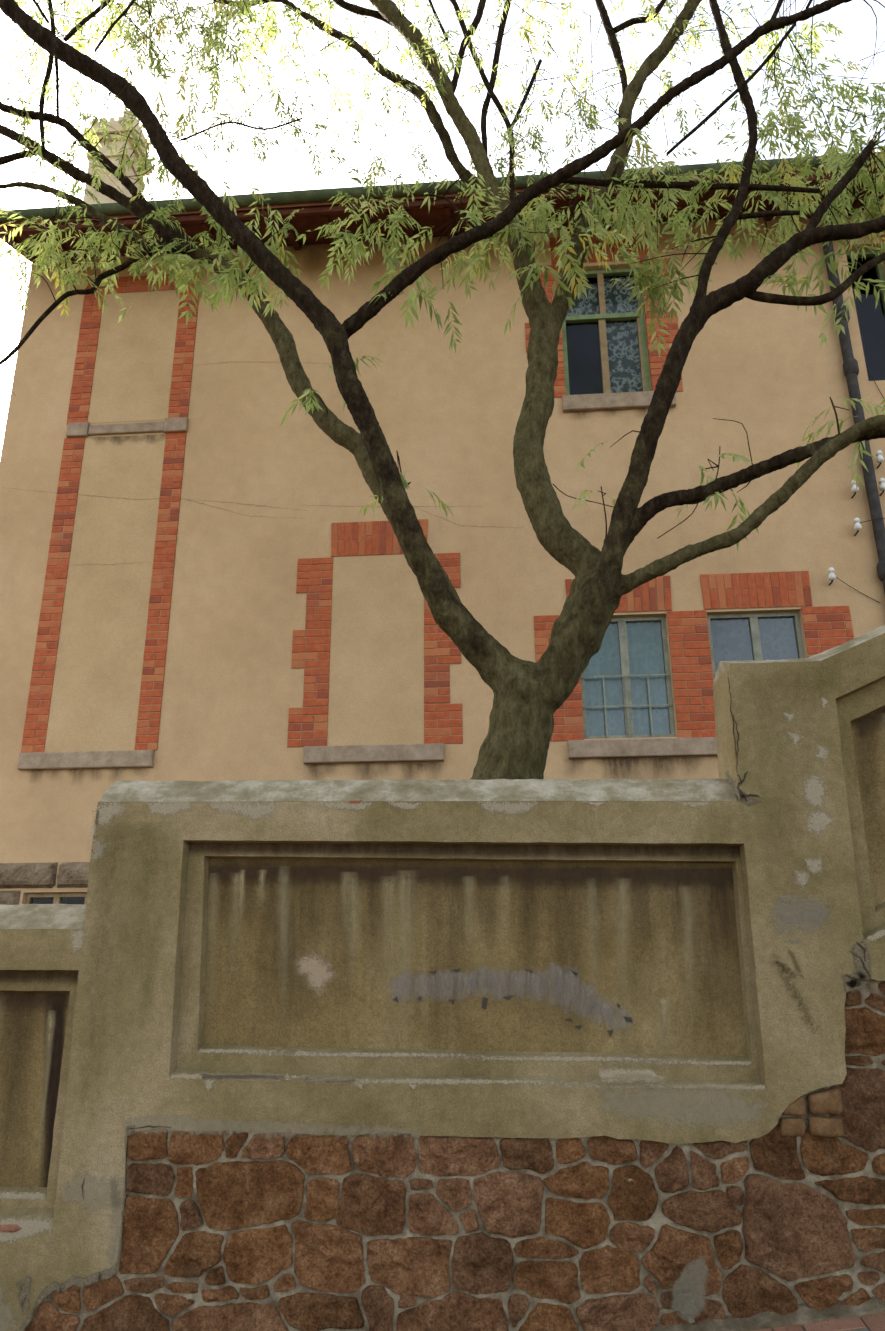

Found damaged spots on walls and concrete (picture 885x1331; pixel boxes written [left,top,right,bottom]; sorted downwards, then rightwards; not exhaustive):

crack [728,678,739,771]
peeling [298,955,334,996]
flaking render [843,930,885,991]
flaking render [779,1088,844,1137]